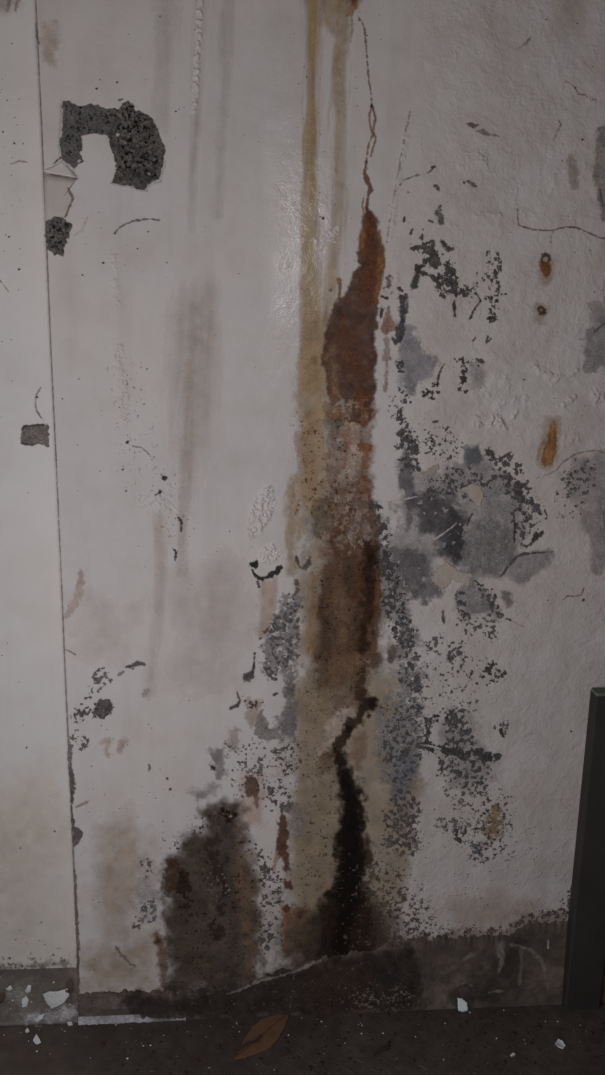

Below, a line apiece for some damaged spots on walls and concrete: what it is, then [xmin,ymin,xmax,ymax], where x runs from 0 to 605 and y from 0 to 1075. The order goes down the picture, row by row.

flaking render [43,79,176,256]
crack [358,18,439,243]
rust [540,253,551,278]
crack [517,209,605,243]
flaking render [581,126,605,221]
rust [273,0,450,969]
peeling [368,217,605,906]
rust [537,417,560,466]
damp [89,801,571,1019]